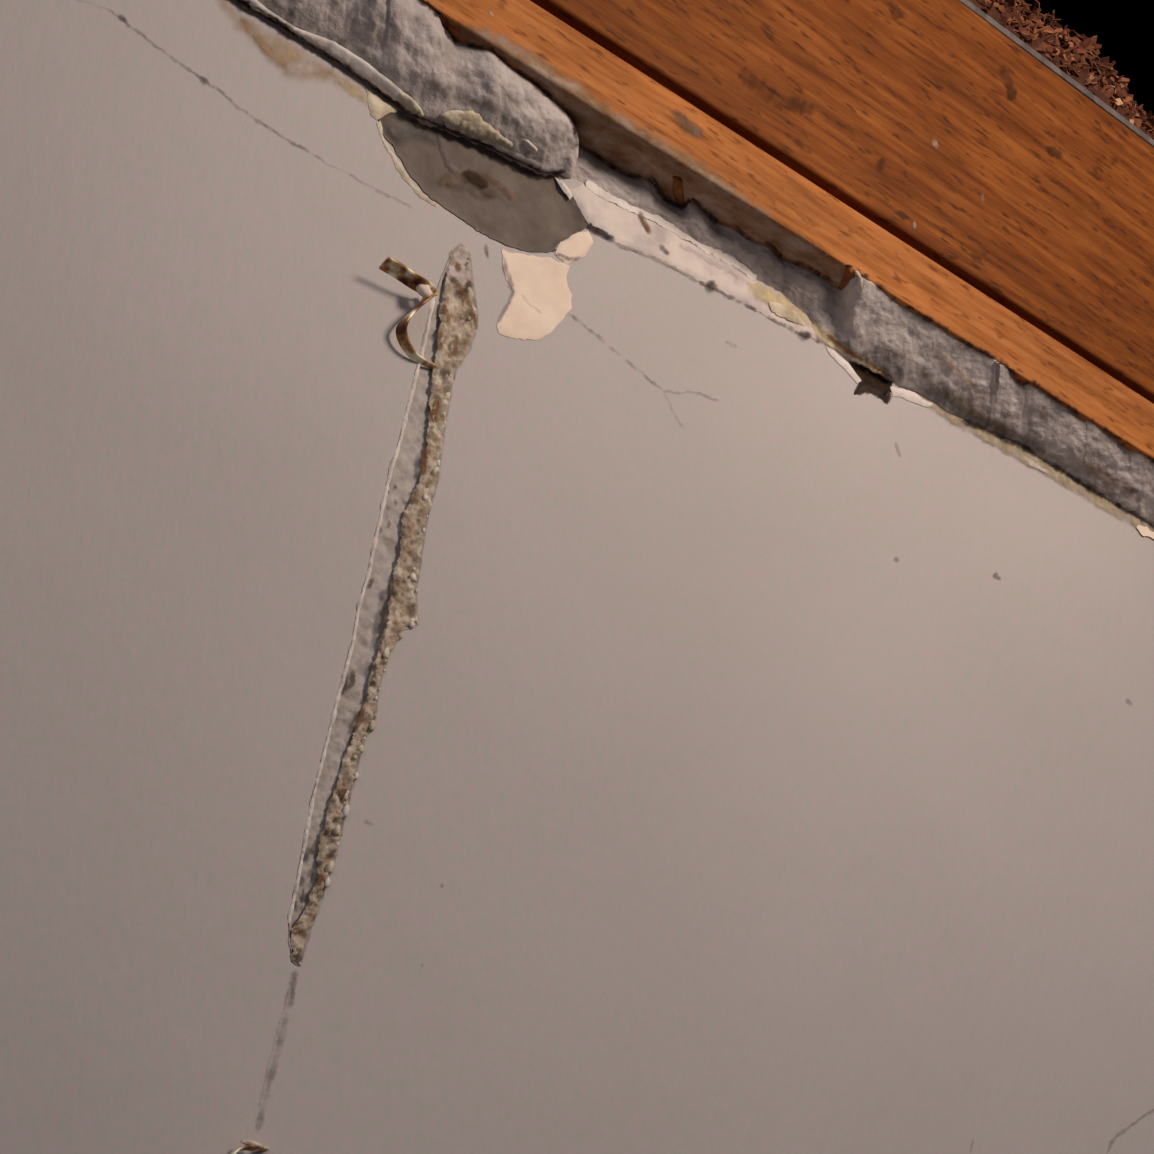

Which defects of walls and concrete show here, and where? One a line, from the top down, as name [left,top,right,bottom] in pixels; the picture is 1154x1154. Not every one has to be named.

crack [235,0,564,176]
spalling [242,0,933,408]
spalling [290,243,478,965]